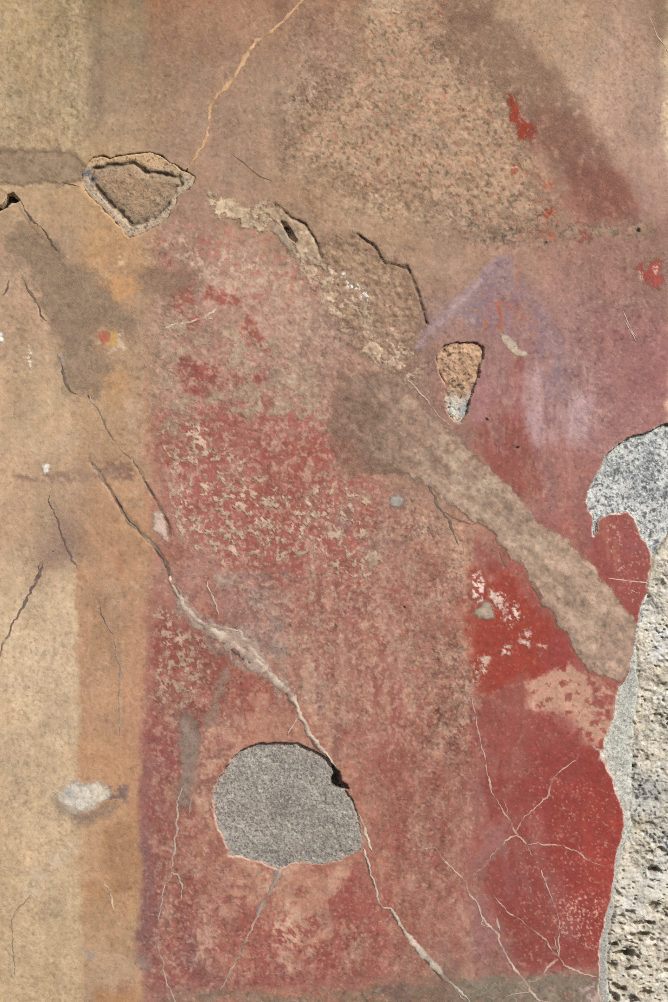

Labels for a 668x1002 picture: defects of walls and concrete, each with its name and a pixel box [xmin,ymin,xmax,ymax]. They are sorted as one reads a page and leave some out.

crack [186,0,304,172]
flaking render [82,152,195,238]
spalling [207,191,283,232]
crack [275,204,411,273]
spalling [287,234,425,385]
flaking render [436,342,483,422]
crack [0,495,79,653]
crack [57,354,336,767]
flaking render [586,424,668,1002]
flaking render [213,742,362,869]
crack [358,814,470,1002]
crack [422,701,602,1002]